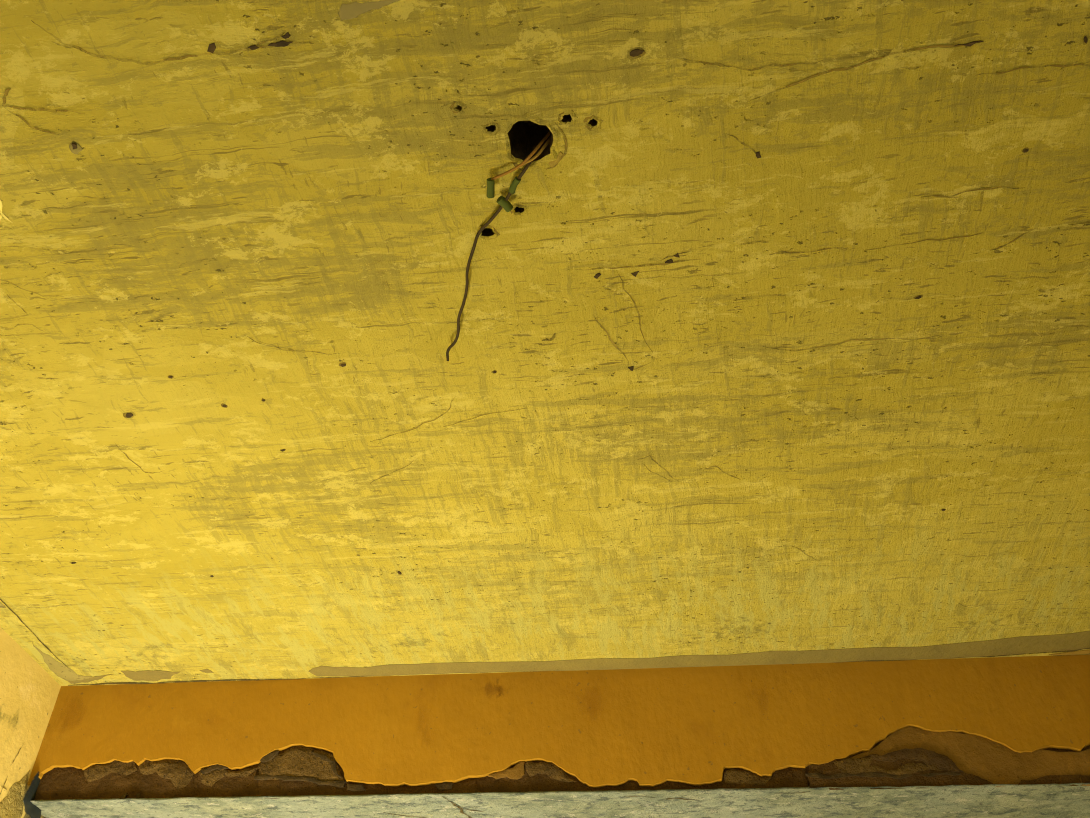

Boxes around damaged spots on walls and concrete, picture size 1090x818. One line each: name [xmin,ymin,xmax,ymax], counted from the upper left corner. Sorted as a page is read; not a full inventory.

crack [684,40,984,101]
crack [979,63,1084,75]
crack [2,88,68,134]
peeling [309,631,1090,676]
spalling [0,726,1090,818]